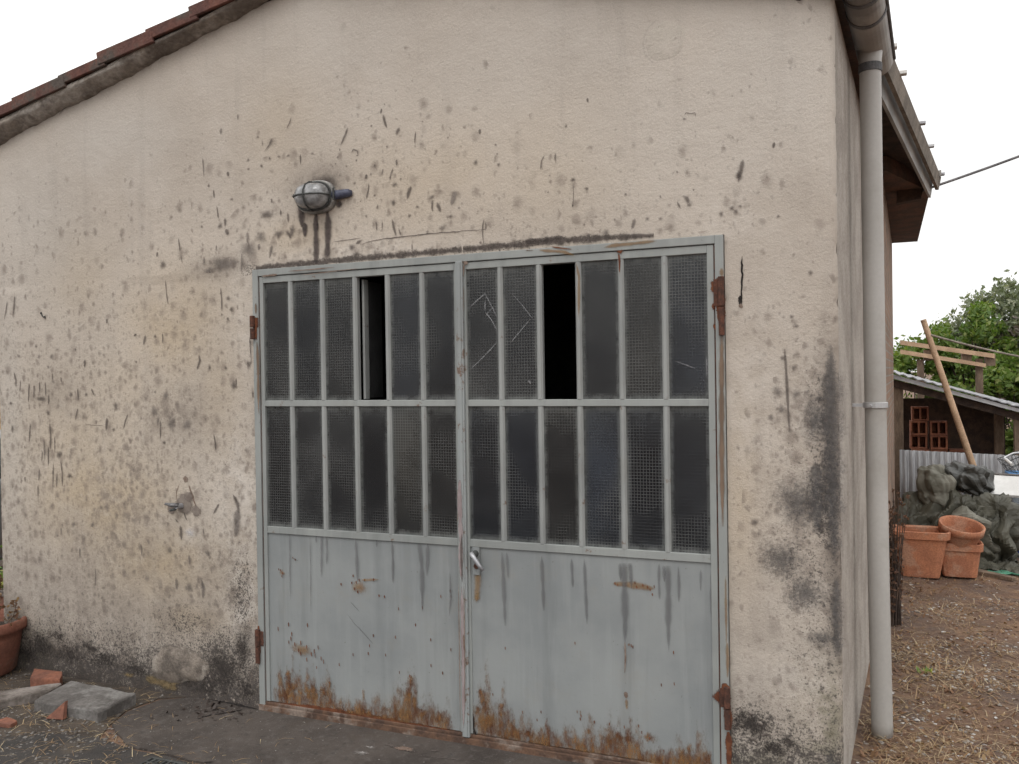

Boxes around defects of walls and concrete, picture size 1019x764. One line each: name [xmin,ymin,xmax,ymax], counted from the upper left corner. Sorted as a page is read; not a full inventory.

water stain [241,199,654,270]
water stain [776,354,844,556]
water stain [20,630,113,665]
water stain [790,577,842,654]
rust [275,670,451,730]
rust [473,681,711,764]